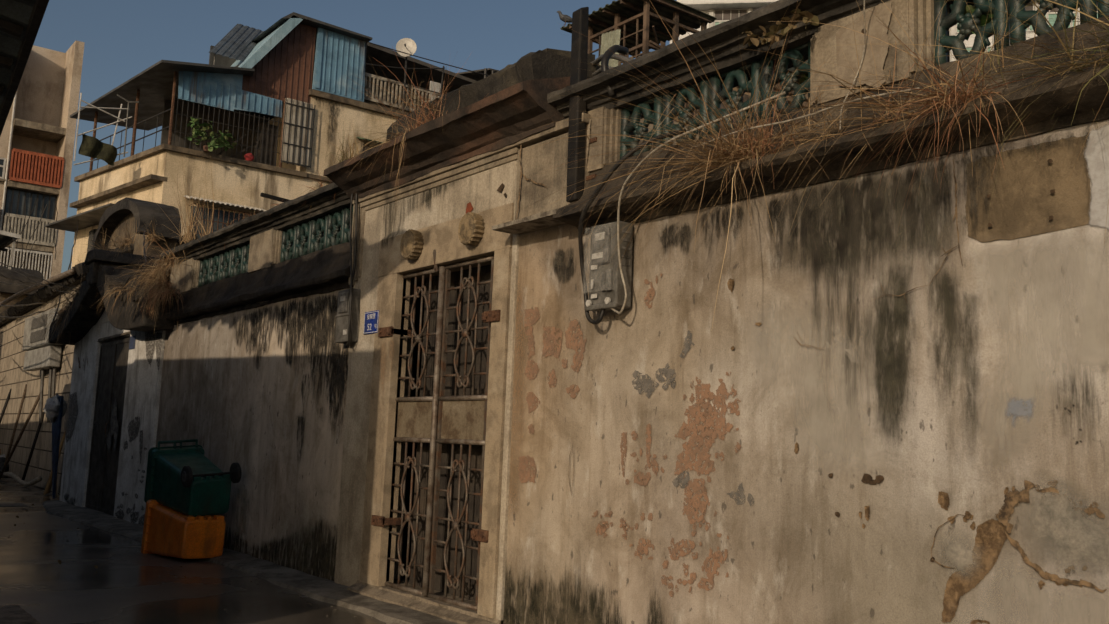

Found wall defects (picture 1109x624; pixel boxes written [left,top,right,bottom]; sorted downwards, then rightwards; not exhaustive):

damp [662,225,690,251]
damp [702,209,743,245]
damp [767,163,950,334]
damp [233,296,348,458]
flaking render [524,307,587,436]
peeling [679,330,694,358]
damp [874,271,908,420]
damp [936,274,976,409]
flaking render [592,363,741,597]
peeling [727,483,754,506]
flaking render [938,491,1008,623]